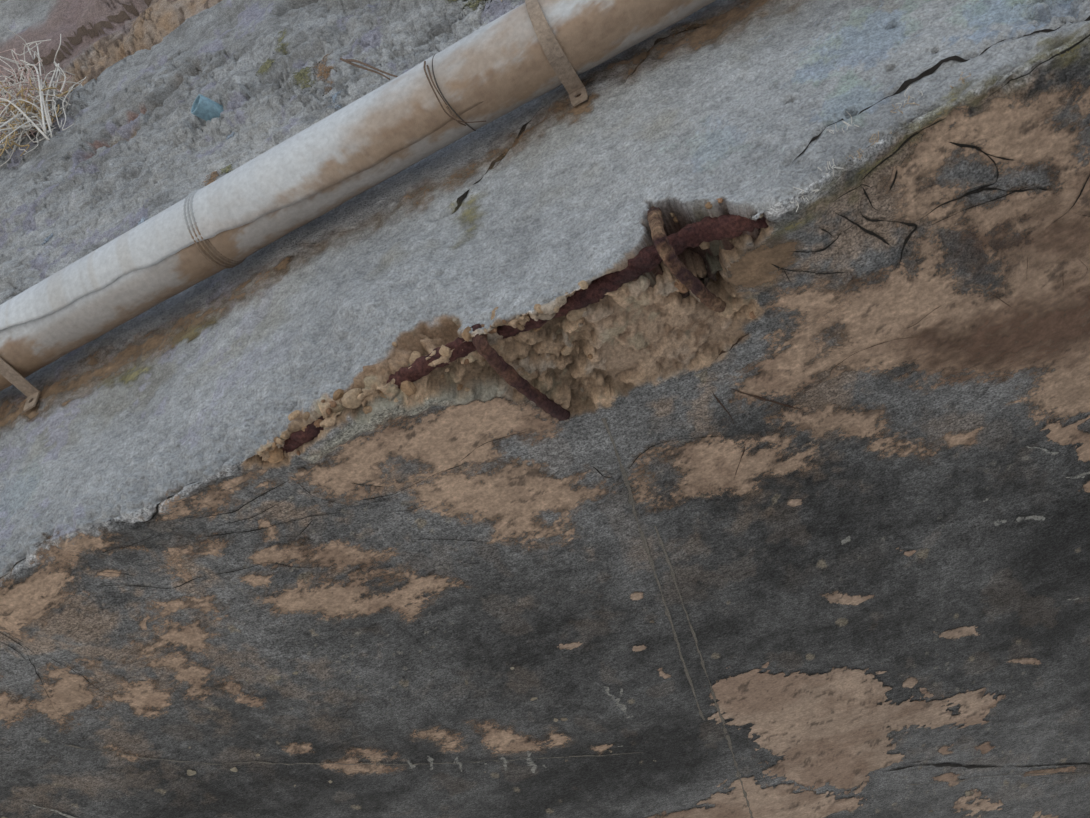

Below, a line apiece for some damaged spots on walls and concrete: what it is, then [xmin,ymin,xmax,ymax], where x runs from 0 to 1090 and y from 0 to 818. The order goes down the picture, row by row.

crack [517,120,531,137]
crack [792,16,1090,163]
crack [437,156,503,221]
crack [770,117,1048,281]
crack [1052,174,1090,224]
peeling [156,82,1090,551]
leakage [915,289,1090,371]
leakage [994,515,1045,526]
peeling [0,529,266,734]
peeling [240,517,471,622]
peeling [557,642,582,650]
peeling [820,590,874,606]